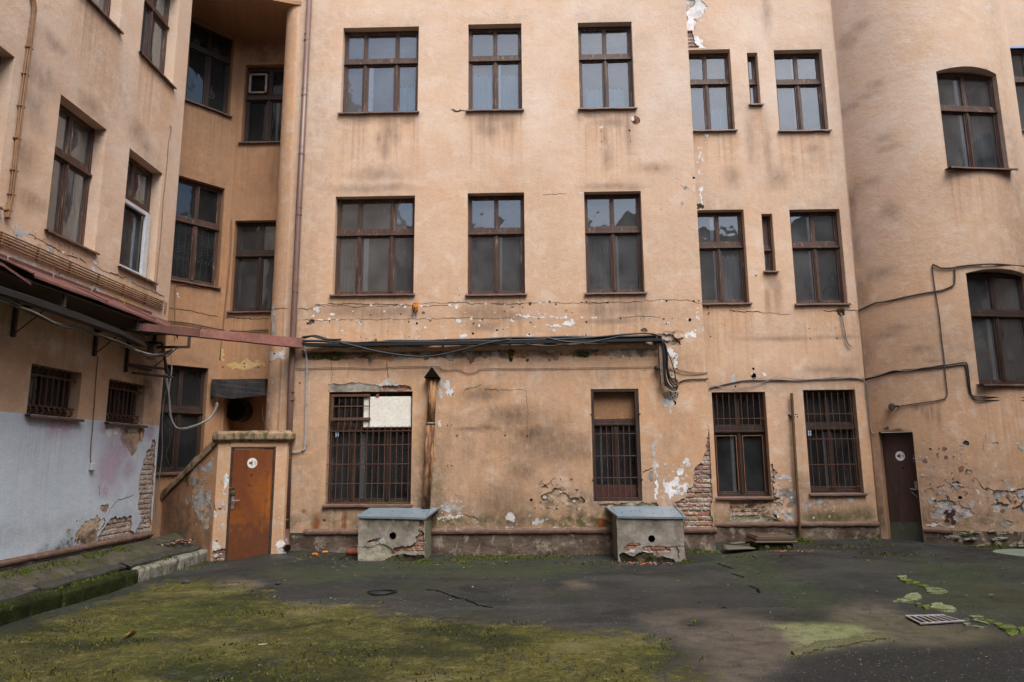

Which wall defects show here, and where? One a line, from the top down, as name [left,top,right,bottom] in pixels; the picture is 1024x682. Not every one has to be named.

peeling [686,0,708,49]
flaking render [301,288,711,413]
peeling [721,368,766,391]
flaking render [67,425,156,553]
flaking render [185,457,229,561]
spalling [436,478,587,528]
spalling [619,543,684,563]
flaking render [600,429,713,527]
flaking render [727,450,856,522]
flaking render [913,437,1024,528]